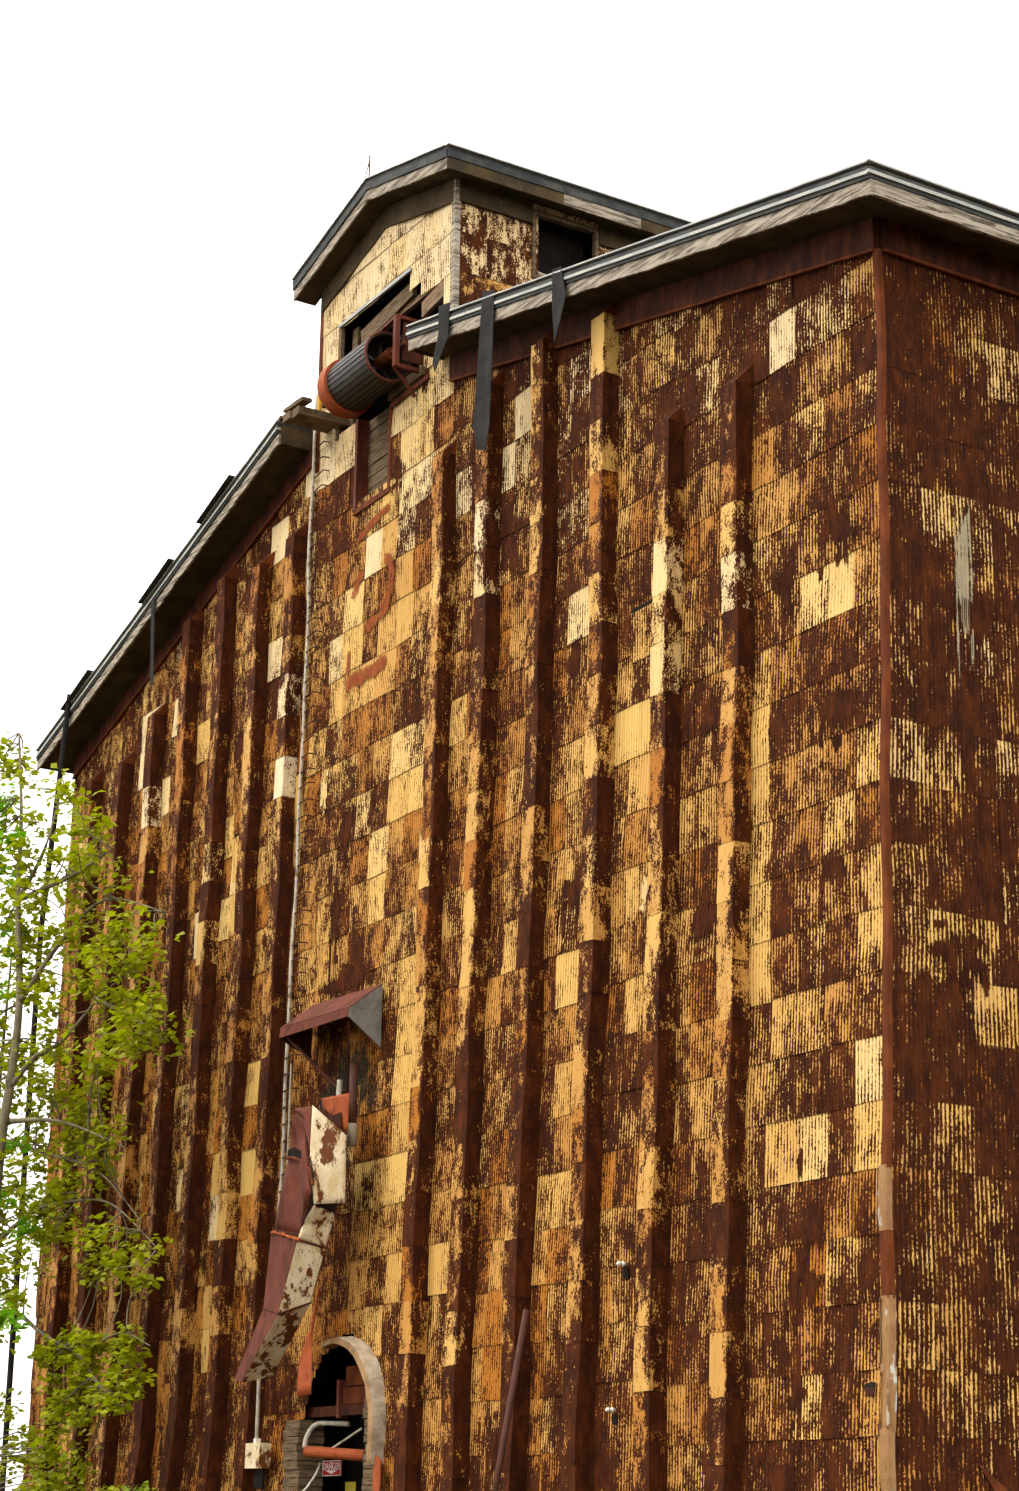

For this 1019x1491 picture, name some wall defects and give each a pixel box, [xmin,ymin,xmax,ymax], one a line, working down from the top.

corrosion [391,456,406,494]
corrosion [812,492,856,586]
corrosion [953,590,1013,672]
corrosion [230,728,244,783]
corrosion [695,680,721,766]
corrosion [318,792,379,1001]
corrosion [554,865,581,948]
corrosion [686,895,717,973]
corrosion [818,845,851,926]
corrosion [931,919,990,999]
corrosion [782,1194,837,1330]
corrosion [783,1365,807,1456]